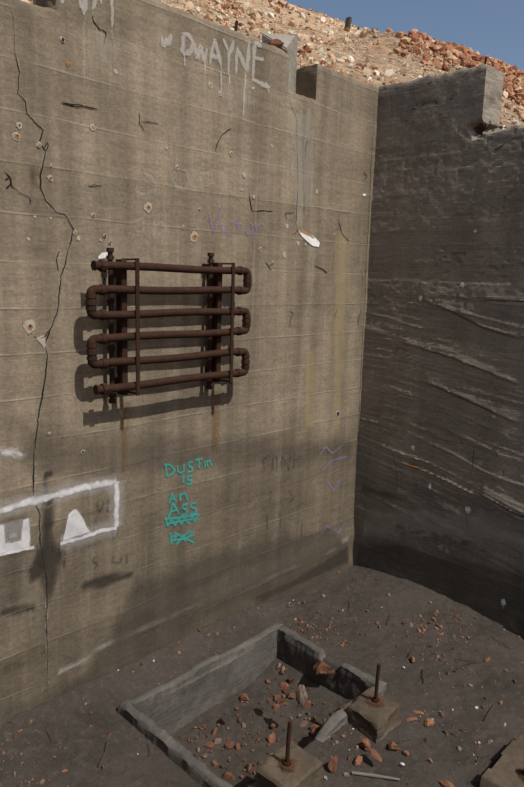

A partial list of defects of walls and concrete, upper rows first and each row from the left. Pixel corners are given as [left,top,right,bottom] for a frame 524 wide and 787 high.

crack [62,102,98,110]
peeling [297,229,320,247]
crack [4,7,74,689]